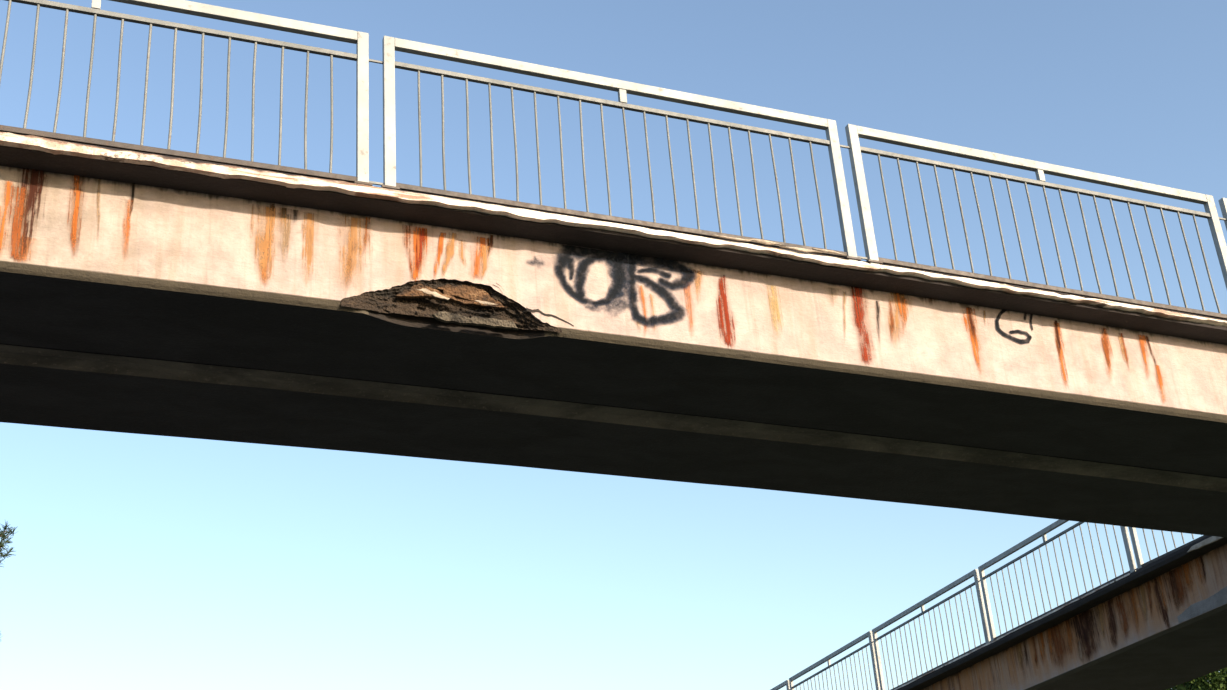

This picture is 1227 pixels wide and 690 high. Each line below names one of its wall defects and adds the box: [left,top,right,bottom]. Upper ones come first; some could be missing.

corrosion [0,168,48,260]
corrosion [67,175,101,246]
corrosion [251,203,314,280]
corrosion [339,216,370,276]
corrosion [404,226,493,279]
spalling [341,280,562,333]
corrosion [684,270,702,325]
corrosion [716,275,736,346]
corrosion [829,286,910,363]
corrosion [963,307,986,366]
corrosion [1054,320,1068,384]
corrosion [1101,328,1165,400]